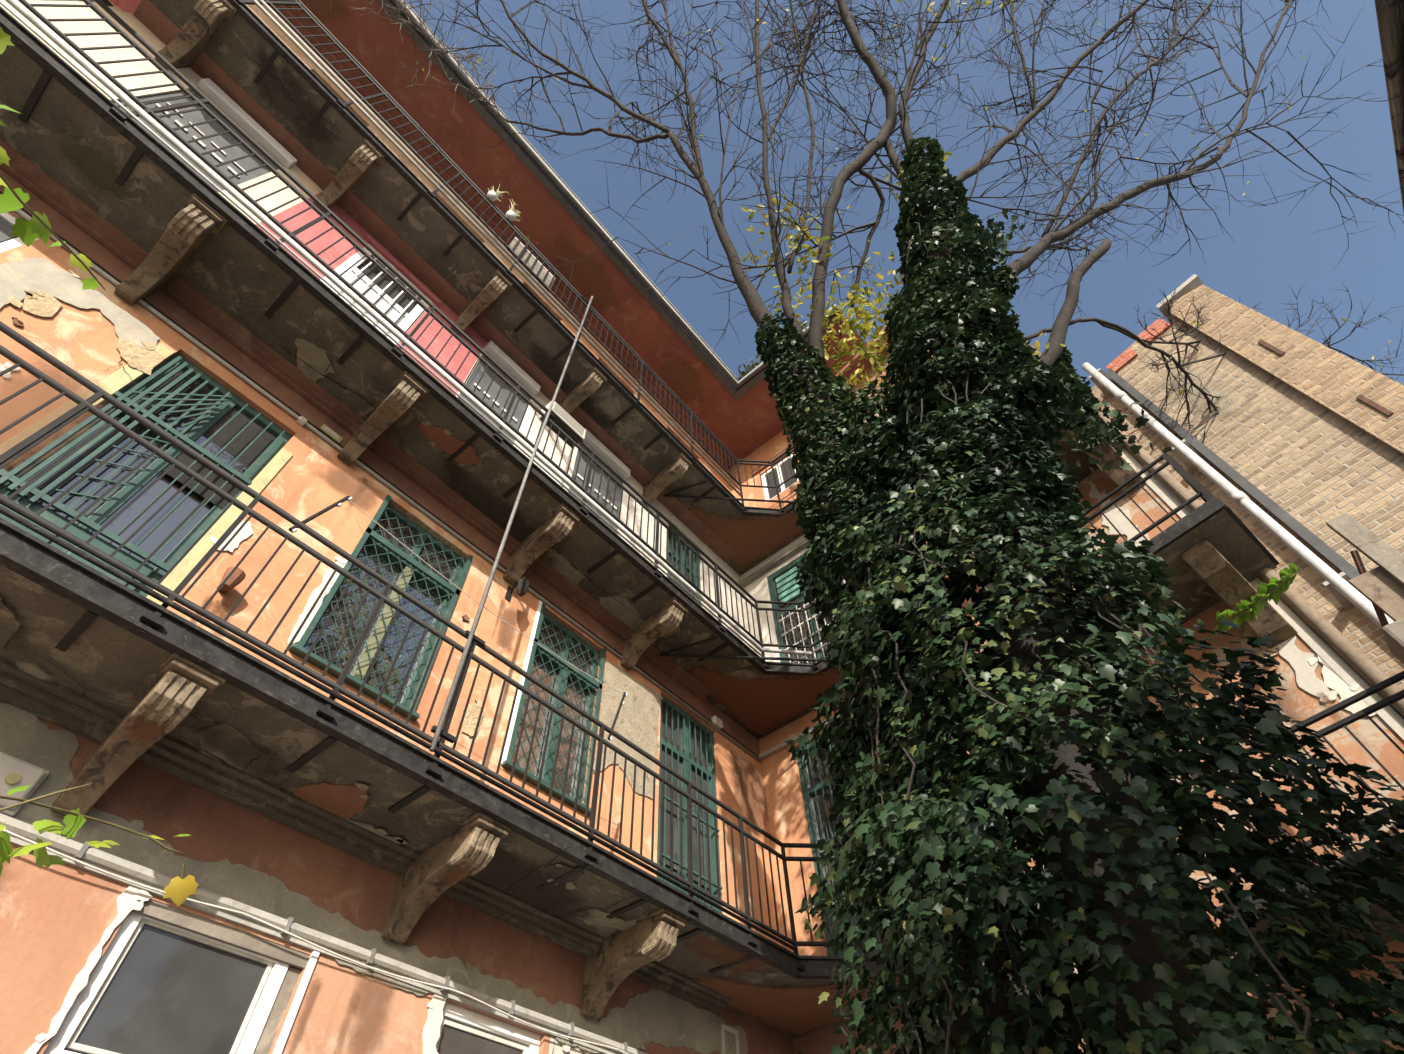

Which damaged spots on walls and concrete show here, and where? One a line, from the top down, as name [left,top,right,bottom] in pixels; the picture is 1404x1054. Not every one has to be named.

peeling [9,290,63,327]
peeling [0,362,20,378]
peeling [1232,609,1377,717]
peeling [294,781,408,845]
peeling [333,957,434,1008]
peeling [555,1028,622,1054]